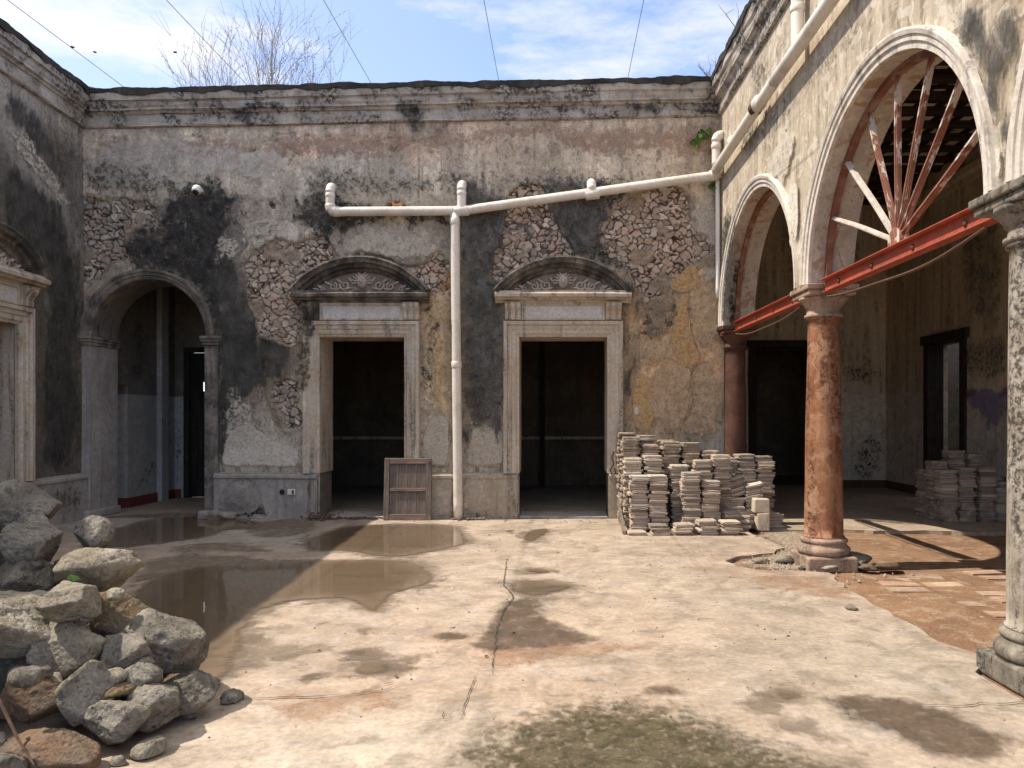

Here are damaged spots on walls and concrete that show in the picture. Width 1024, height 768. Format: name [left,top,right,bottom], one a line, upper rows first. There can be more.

damp [6,95,66,186]
damp [5,166,81,469]
damp [83,159,315,460]
flaking render [83,129,407,285]
flaking render [214,197,451,433]
damp [293,169,630,444]
flaking render [492,185,574,281]
crack [404,559,522,725]